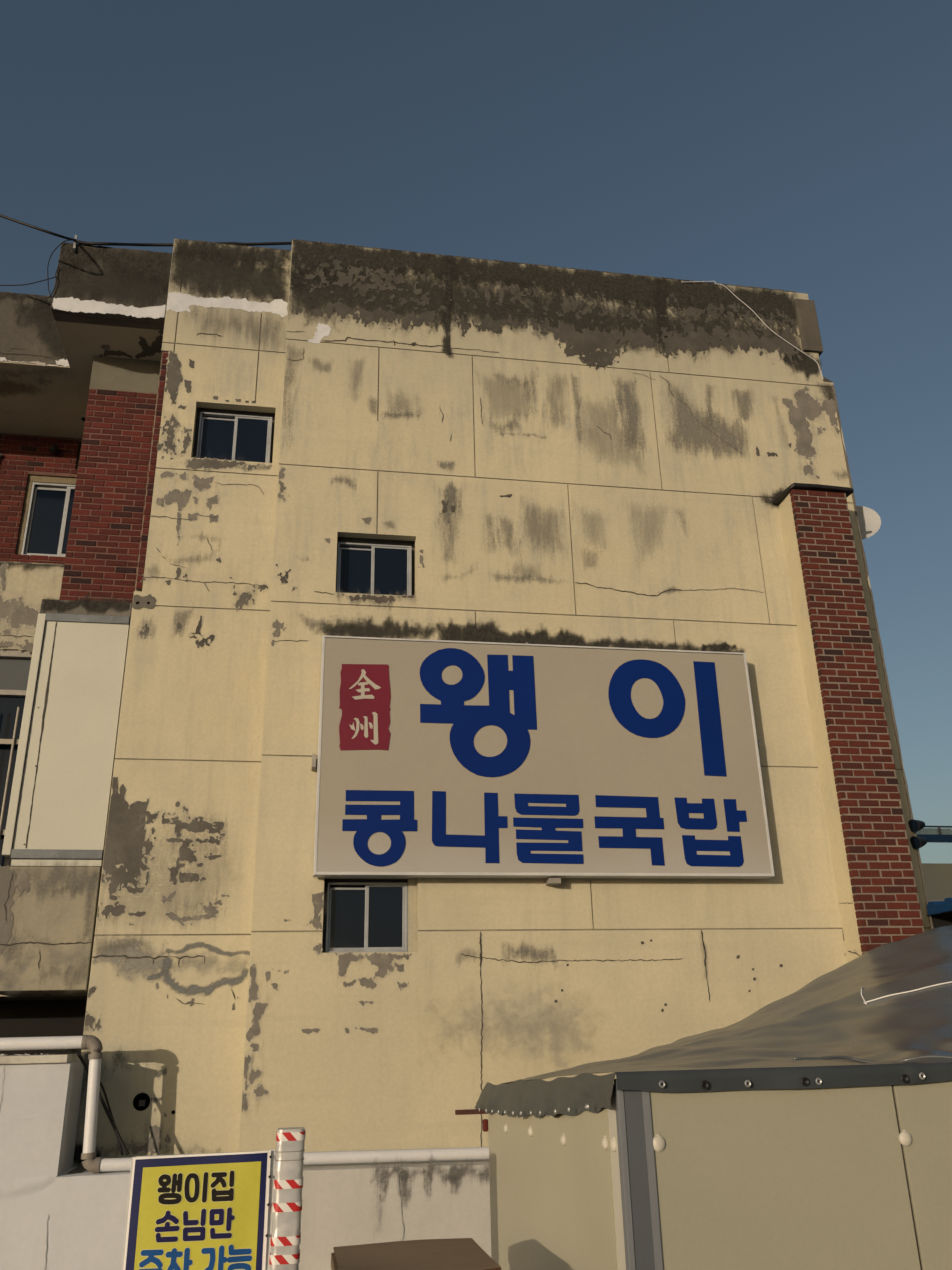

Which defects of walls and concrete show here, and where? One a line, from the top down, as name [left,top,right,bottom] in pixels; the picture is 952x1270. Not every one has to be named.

water stain [0,239,835,401]
peeling [54,311,290,546]
water stain [617,382,639,446]
water stain [672,390,749,456]
peeling [0,563,40,653]
peeling [229,564,303,612]
water stain [271,618,744,653]
crack [575,582,763,596]
peeling [95,777,230,932]
peeling [307,892,412,1006]
peeling [344,1027,378,1035]